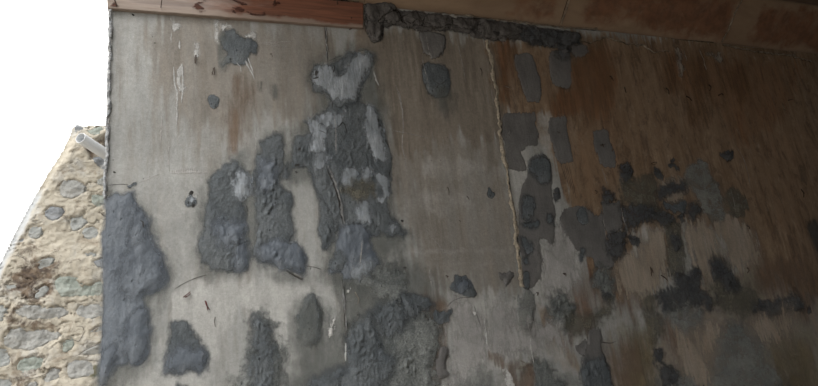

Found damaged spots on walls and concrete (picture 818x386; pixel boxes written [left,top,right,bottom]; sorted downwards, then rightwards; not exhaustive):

water stain [521,213,554,289]